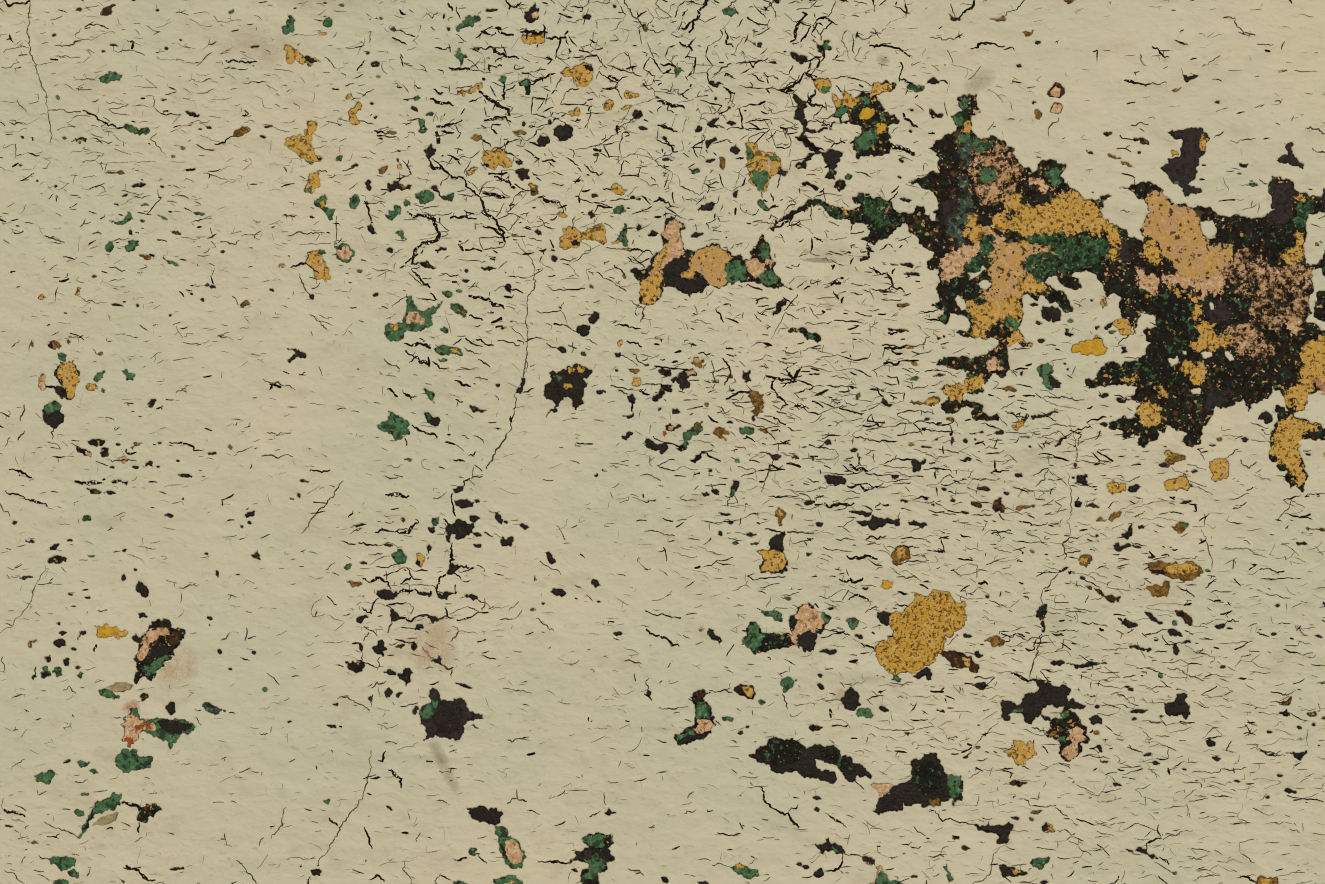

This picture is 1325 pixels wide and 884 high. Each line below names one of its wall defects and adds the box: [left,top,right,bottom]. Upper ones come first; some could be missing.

crack [970,42,1015,51]
crack [1065,0,1325,213]
peeling [544,77,1325,504]
crack [254,367,323,416]
crack [226,432,343,533]
crack [1,644,102,769]
peeling [32,569,195,773]
peeling [412,656,483,740]
peeling [742,590,1016,718]
peeling [749,724,1054,850]
peeling [1001,679,1108,787]
crack [1287,758,1324,810]